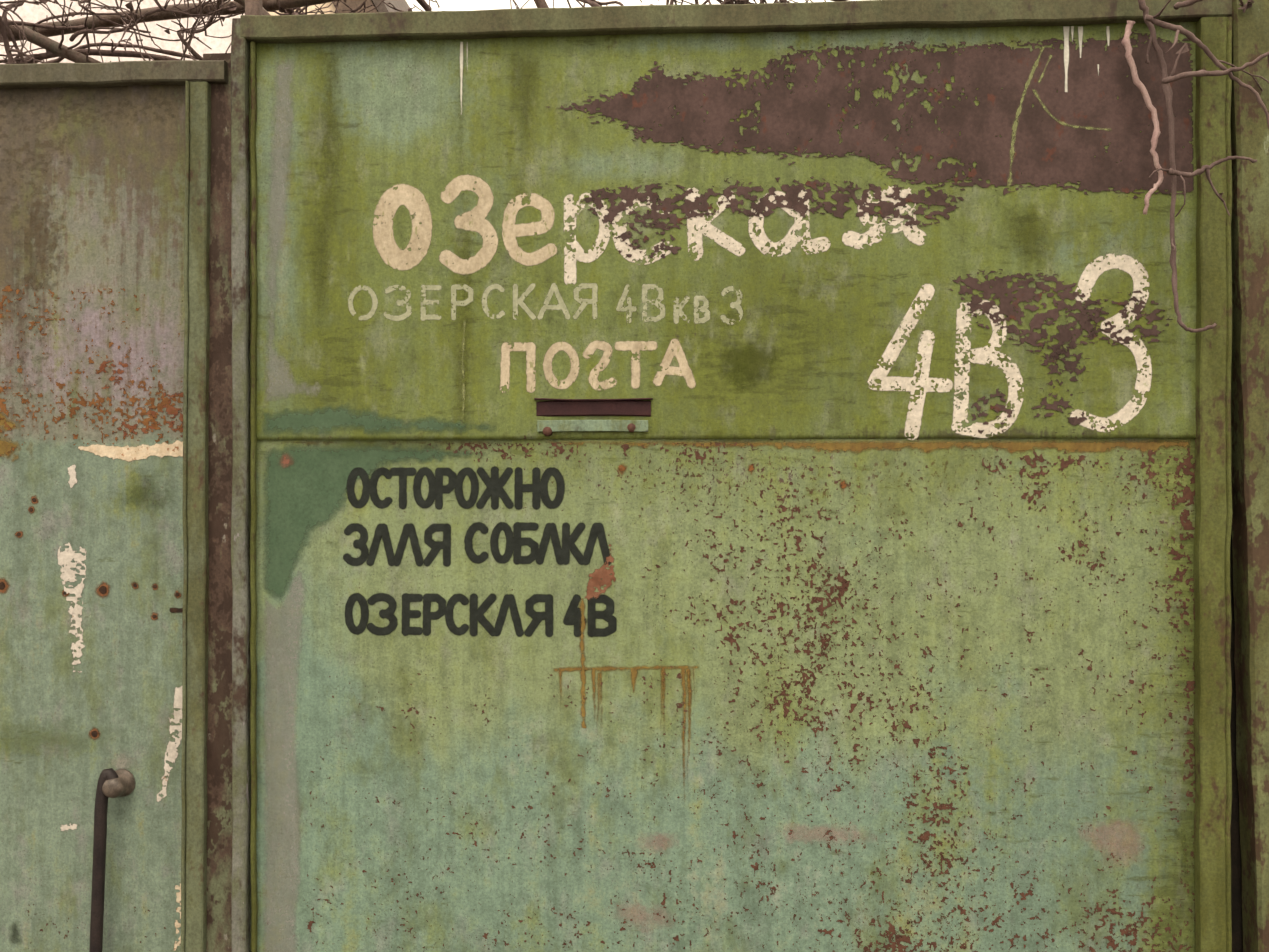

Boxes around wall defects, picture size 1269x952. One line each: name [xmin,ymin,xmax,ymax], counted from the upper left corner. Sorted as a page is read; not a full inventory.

peeling [548,30,1194,258]
rust [96,360,128,390]
rust [112,392,183,437]
peeling [427,443,761,471]
rust [606,441,1189,453]
peeling [950,269,1173,434]
rust [0,579,9,593]
peeling [57,542,87,673]
rust [96,582,110,597]
peeling [157,686,182,802]
rust [554,544,698,777]
peeling [410,448,1195,952]